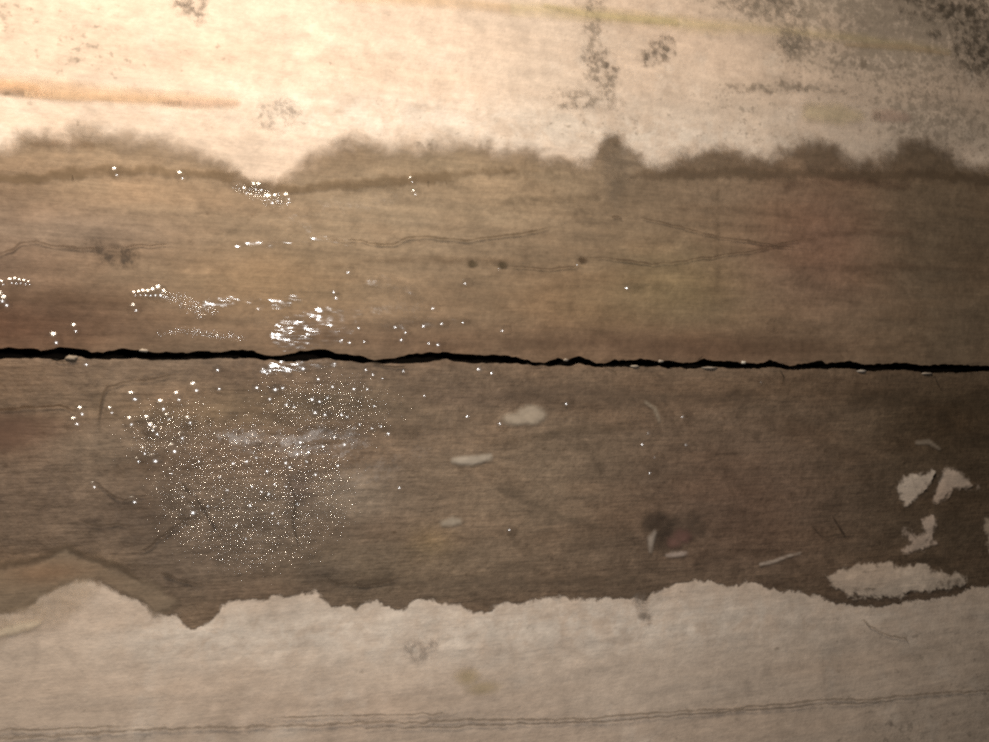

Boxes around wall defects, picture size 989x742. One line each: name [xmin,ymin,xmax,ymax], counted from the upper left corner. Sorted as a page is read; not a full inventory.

leakage [573,8,616,105]
leakage [907,0,989,71]
crack [0,347,989,412]
leakage [0,135,989,629]